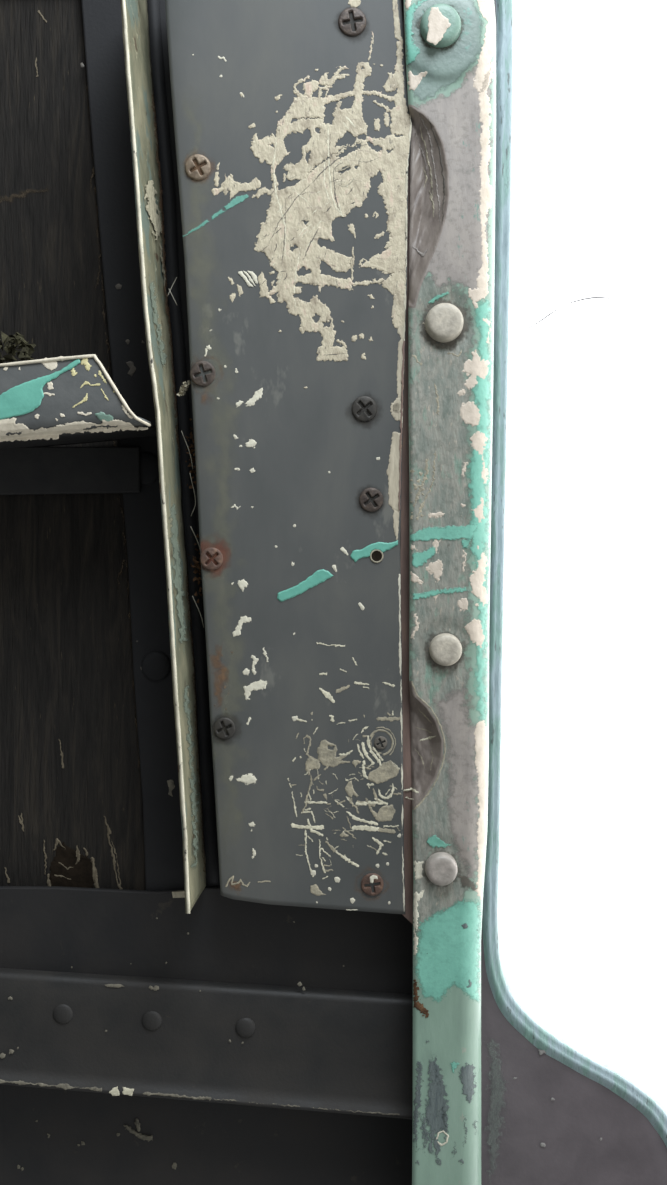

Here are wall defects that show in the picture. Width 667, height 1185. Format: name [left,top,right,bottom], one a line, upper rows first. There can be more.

peeling [0,356,148,442]
peeling [211,0,496,955]
corrosion [413,979,429,1018]